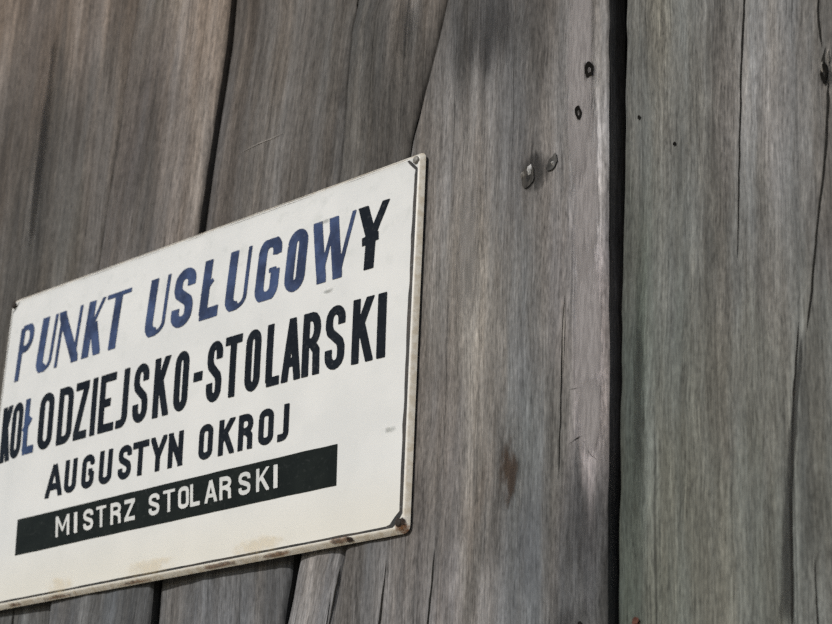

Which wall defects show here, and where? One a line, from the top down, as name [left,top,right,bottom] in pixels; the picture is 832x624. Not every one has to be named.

crack [737,0,745,252]
crack [783,0,829,624]